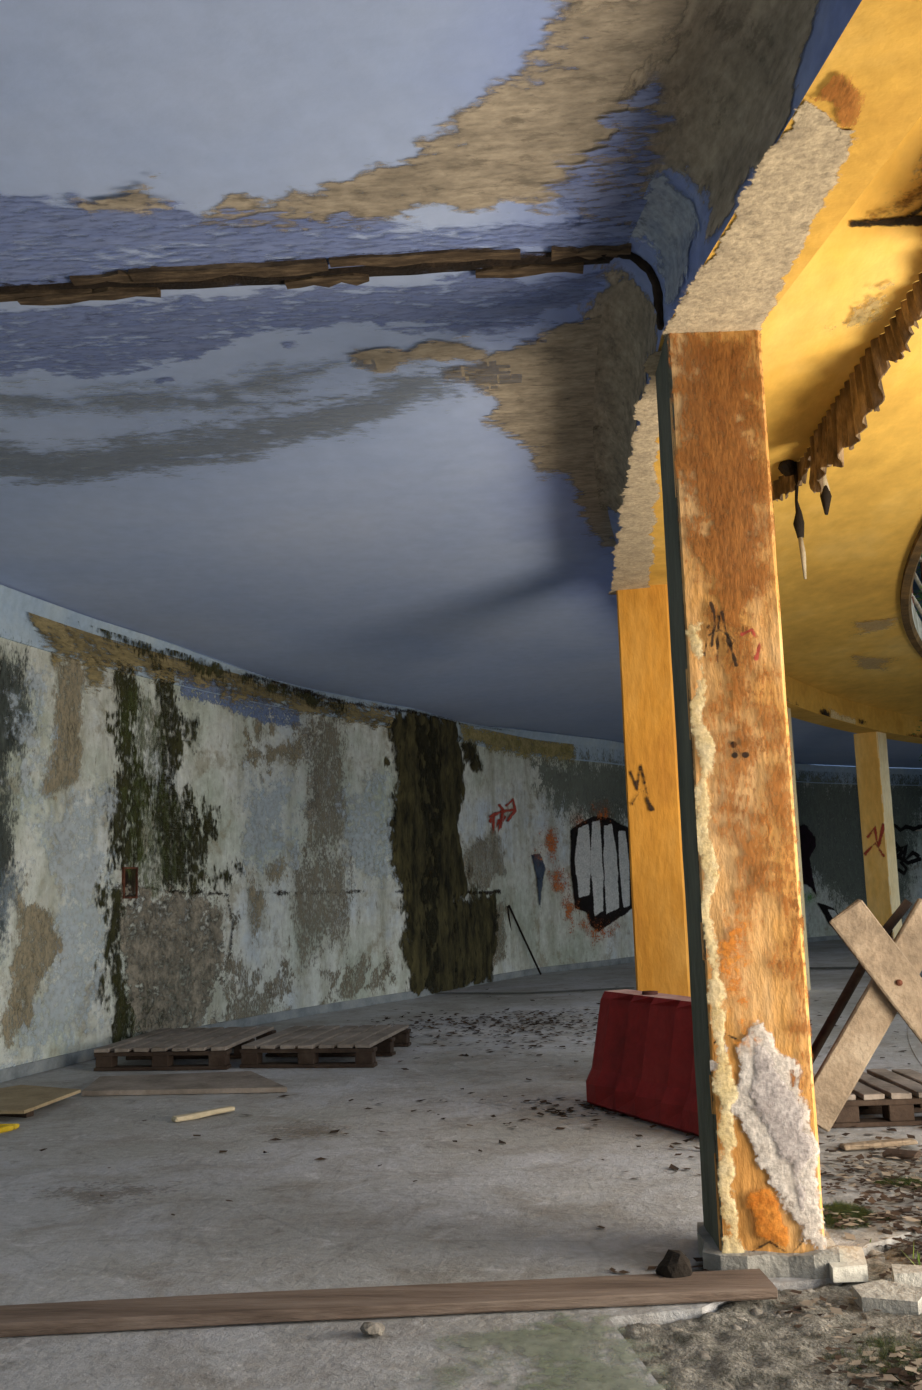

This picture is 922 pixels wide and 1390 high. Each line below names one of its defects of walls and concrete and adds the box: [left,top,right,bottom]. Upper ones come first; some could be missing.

peeling [0,74,864,595]
damp [0,647,39,958]
damp [28,612,394,1043]
rust [667,329,813,1101]
peeling [685,623,827,1253]
spalling [621,1241,922,1390]